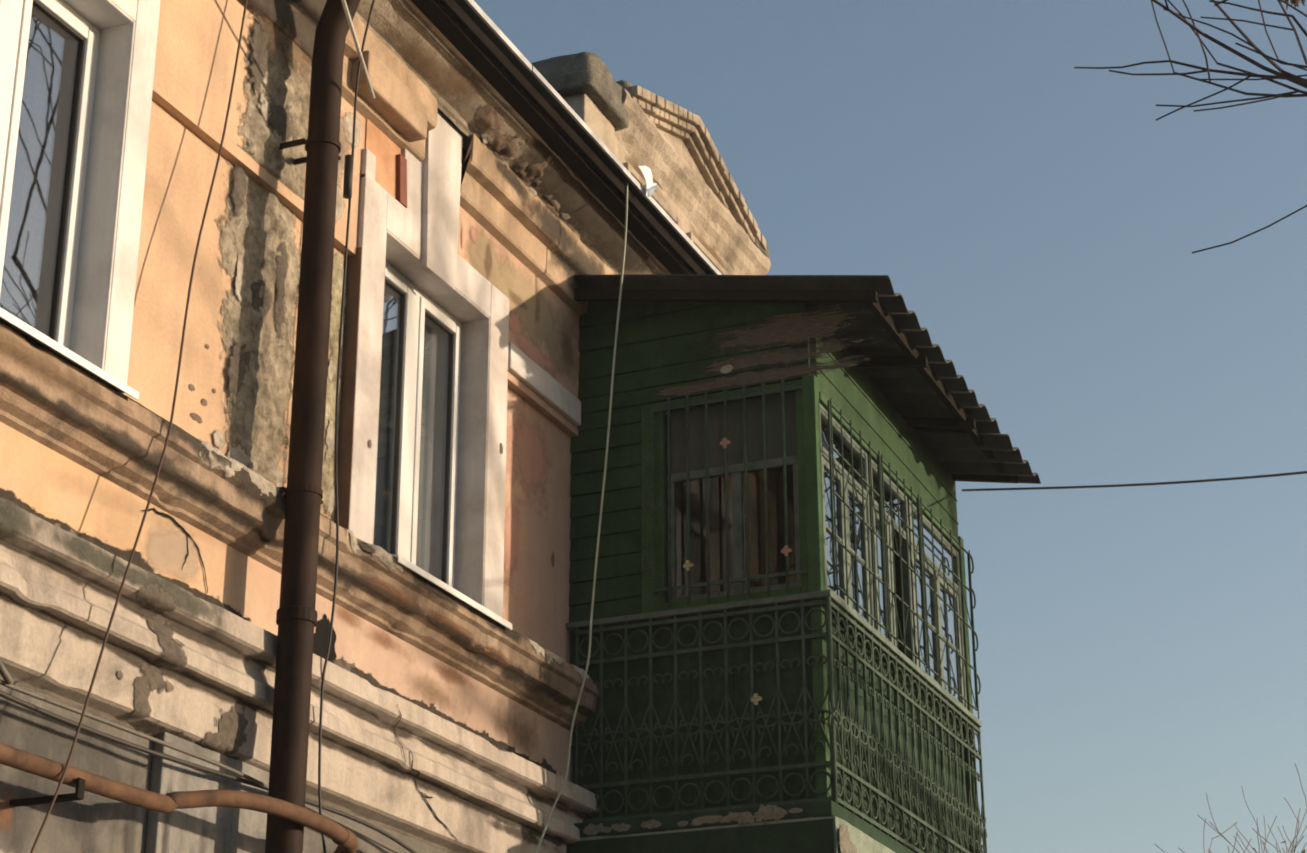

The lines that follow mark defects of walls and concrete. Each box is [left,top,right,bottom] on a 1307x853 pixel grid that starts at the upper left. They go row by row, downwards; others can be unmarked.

spalling [189,12,312,500]
flaking render [335,112,360,222]
leakage [497,139,657,293]
leakage [699,239,723,267]
flaking render [320,252,346,514]
peeling [652,304,877,396]
flaking render [0,488,251,622]
flaking render [331,656,557,774]
spalling [583,819,661,835]
spalling [677,804,803,827]